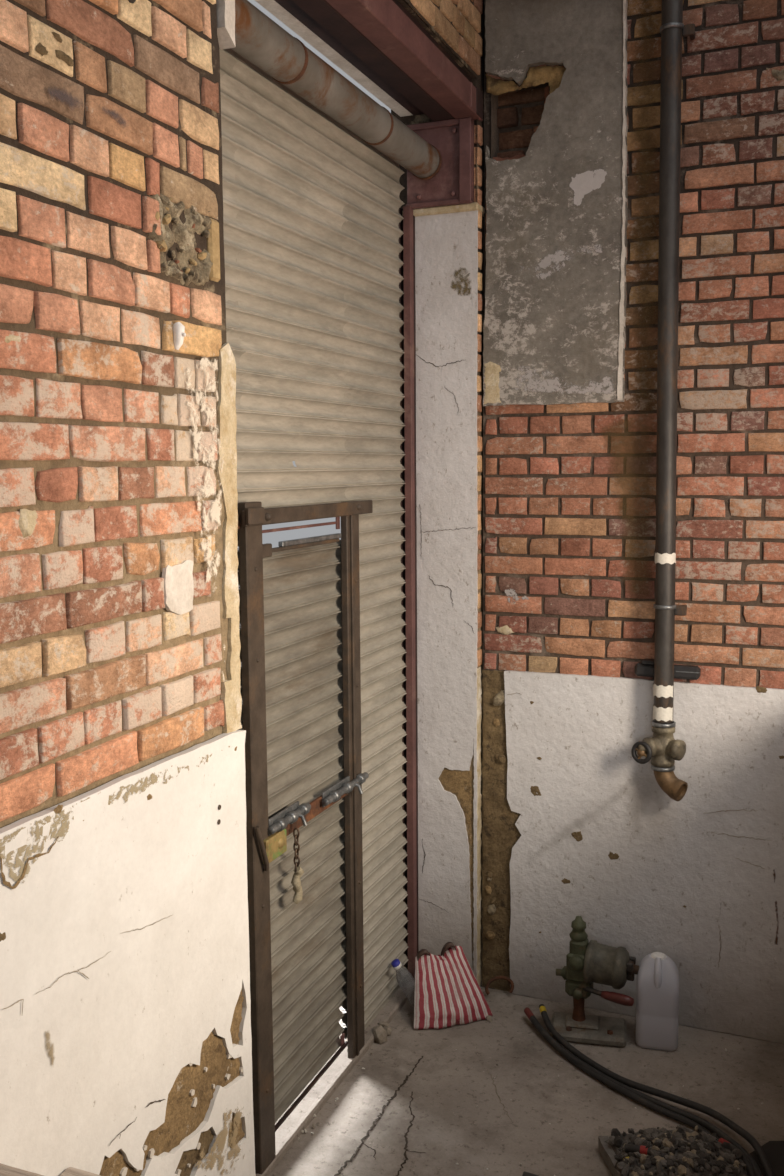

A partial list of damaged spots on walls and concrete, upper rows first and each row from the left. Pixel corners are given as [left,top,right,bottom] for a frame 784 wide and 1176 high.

spalling [486,65,566,161]
spalling [147,193,220,286]
flaking render [0,754,212,889]
flaking render [440,667,521,992]
spalling [99,989,245,1176]
crack [334,1056,425,1176]